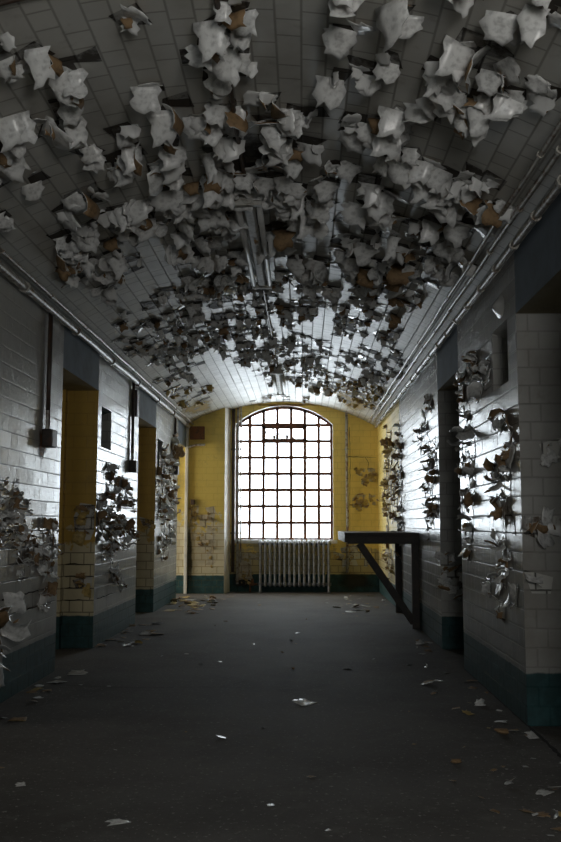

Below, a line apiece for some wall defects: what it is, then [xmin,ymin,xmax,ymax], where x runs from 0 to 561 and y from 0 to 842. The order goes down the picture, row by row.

peeling [0,0,561,411]
peeling [0,422,216,688]
peeling [381,544,404,581]
peeling [349,394,438,541]
peeling [434,350,561,624]